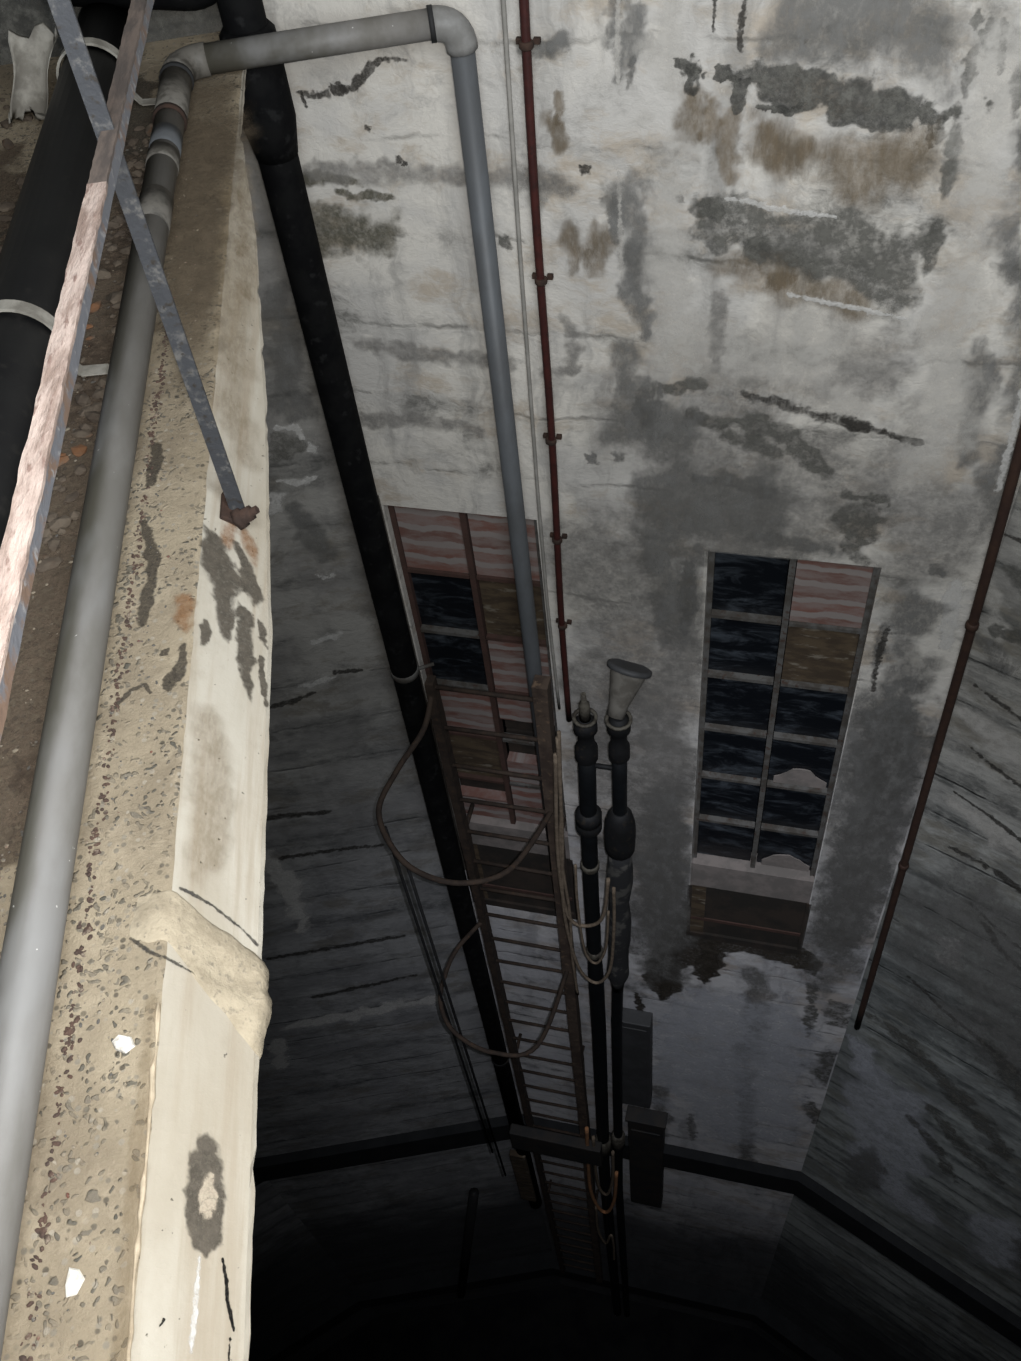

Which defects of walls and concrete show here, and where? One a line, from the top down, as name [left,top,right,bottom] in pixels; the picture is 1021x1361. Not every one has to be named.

damp [606,5,645,81]
damp [761,0,952,71]
damp [963,9,1021,115]
damp [675,87,963,320]
damp [552,184,1021,1180]
damp [185,1135,225,1288]
damp [190,1306,198,1351]
crack [221,1257,235,1361]